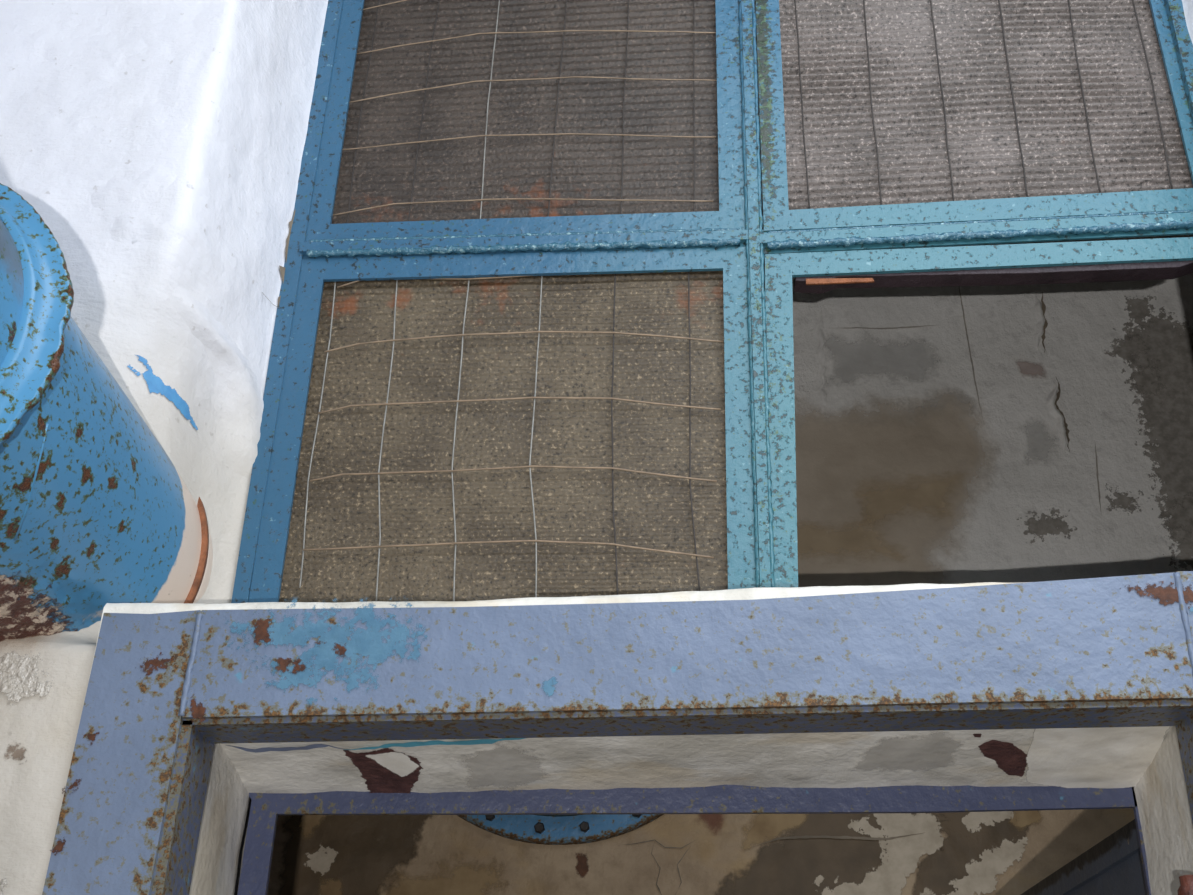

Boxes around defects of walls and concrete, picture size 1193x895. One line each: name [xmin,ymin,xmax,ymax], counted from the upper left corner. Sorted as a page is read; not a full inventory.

crack [1040,292,1048,353]
damp [1105,296,1167,398]
crack [1055,378,1101,510]
damp [1105,483,1144,514]
rust [1120,581,1193,609]
rust [140,652,174,676]
peeling [227,599,427,705]
rust [190,699,206,722]
spalling [343,748,423,793]
rust [52,839,66,856]
damp [716,813,888,895]
damp [911,811,1029,895]